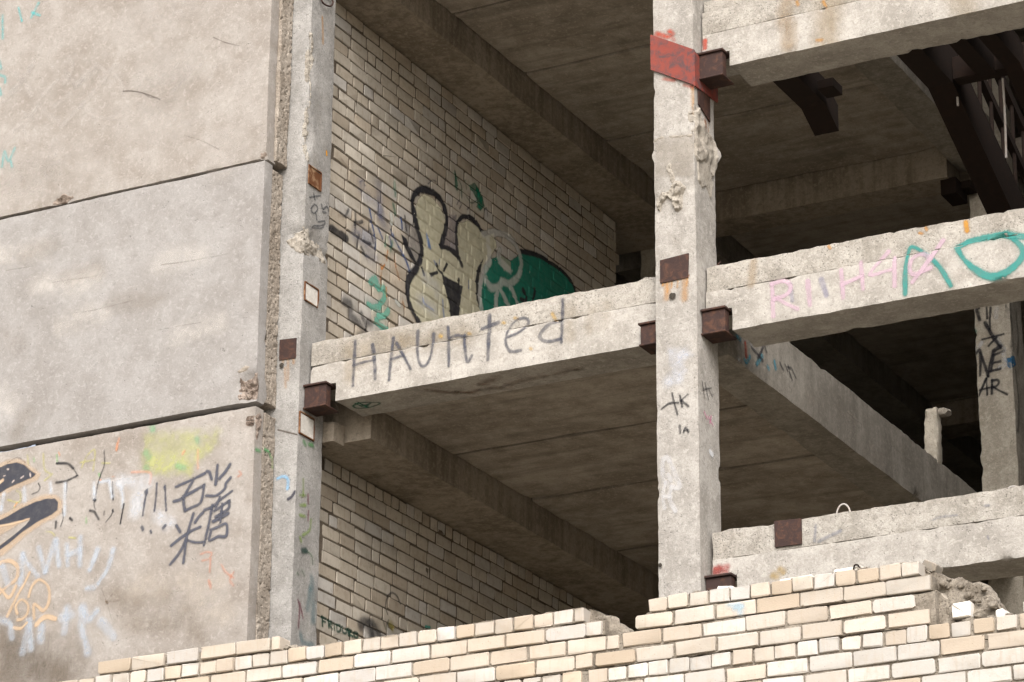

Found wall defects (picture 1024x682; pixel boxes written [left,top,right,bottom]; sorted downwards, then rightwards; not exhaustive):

spalling [286,225,326,264]